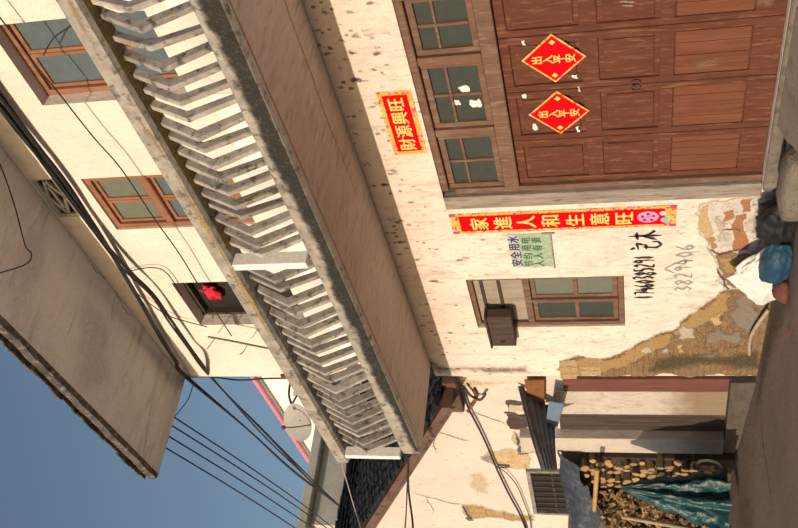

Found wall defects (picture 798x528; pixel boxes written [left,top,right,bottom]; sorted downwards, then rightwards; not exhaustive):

spalling [556,196,774,379]
spalling [480,400,536,470]
spalling [461,504,535,522]